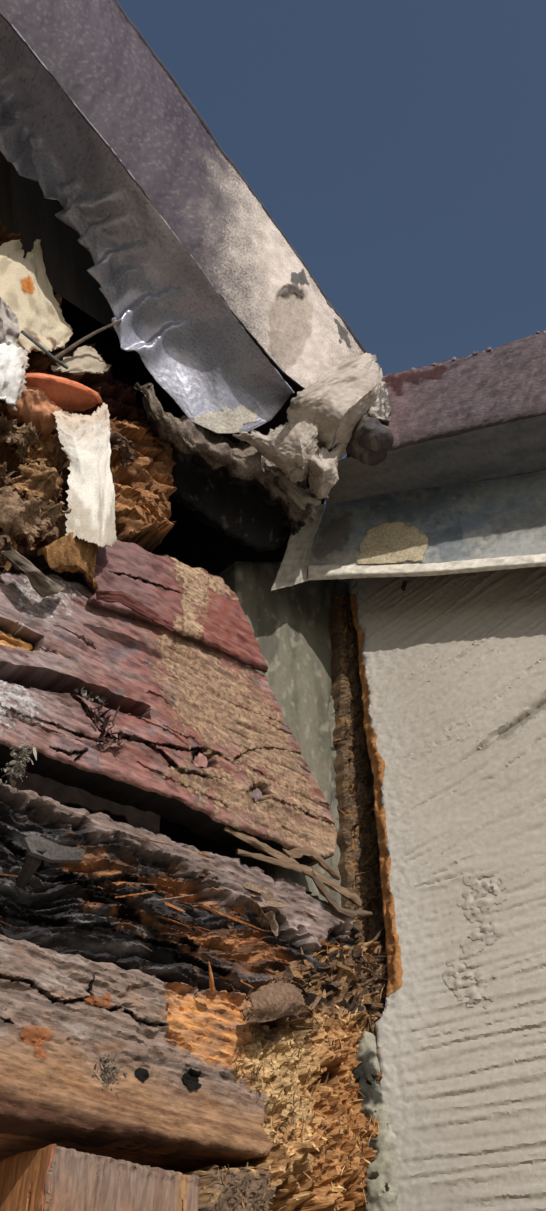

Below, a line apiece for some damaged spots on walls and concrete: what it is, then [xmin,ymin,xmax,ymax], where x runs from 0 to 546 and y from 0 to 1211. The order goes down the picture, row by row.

peeling [291,269,310,288]
peeling [0,445,25,498]
peeling [0,527,53,574]
crack [110,571,183,595]
crack [2,695,328,823]
peeling [199,594,404,1211]
crack [0,974,165,1027]